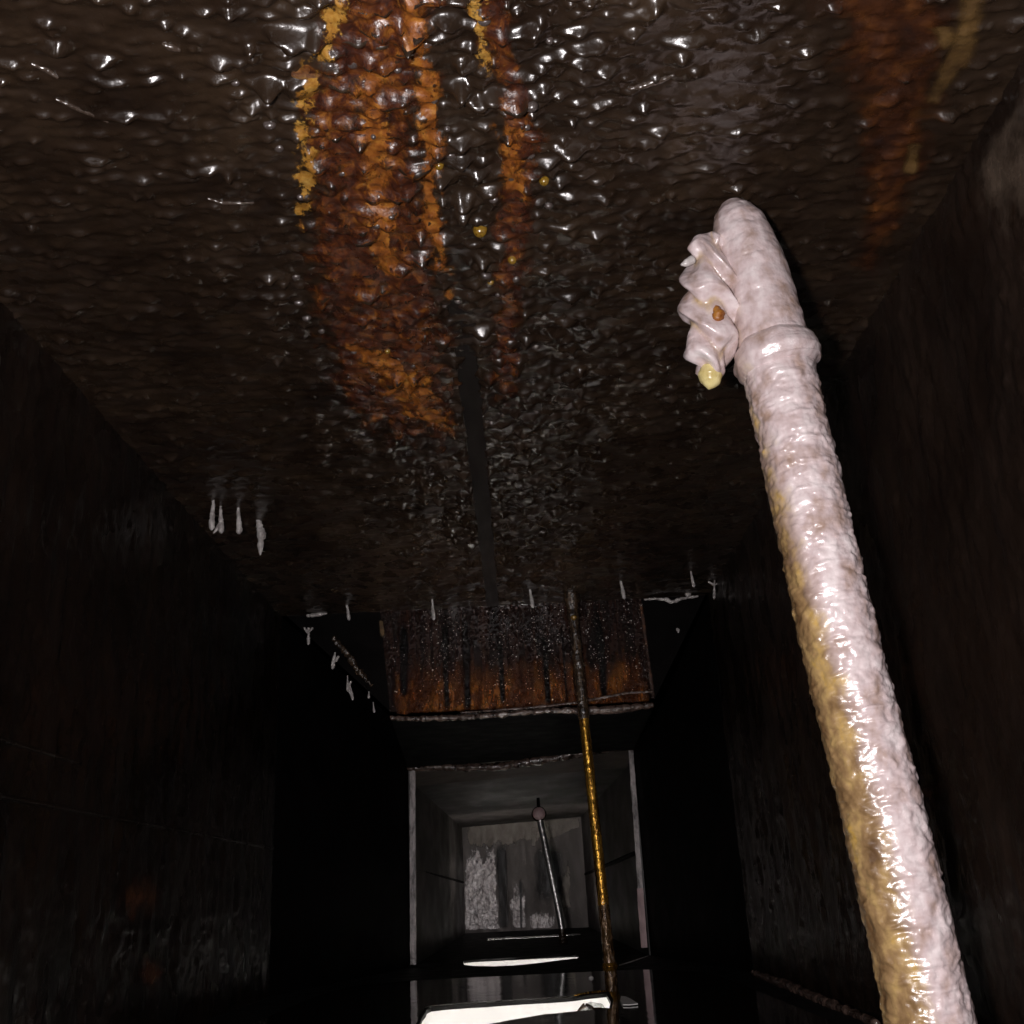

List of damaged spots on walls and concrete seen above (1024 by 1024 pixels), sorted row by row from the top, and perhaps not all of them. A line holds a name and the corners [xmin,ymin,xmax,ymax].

corrosion [293,0,455,452]
corrosion [466,0,544,405]
corrosion [392,601,654,714]